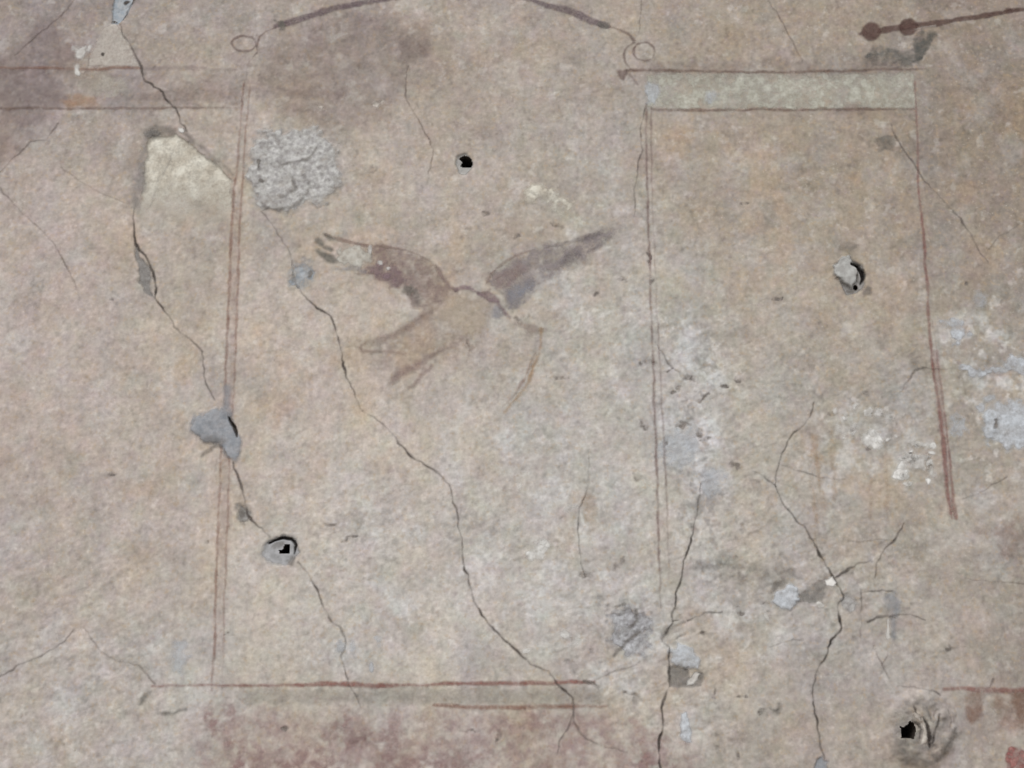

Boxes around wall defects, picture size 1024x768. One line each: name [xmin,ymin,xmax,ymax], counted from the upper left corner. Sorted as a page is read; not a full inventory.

flaking render [142,128,232,209]
flaking render [135,248,152,296]
crack [134,233,163,308]
flaking render [611,608,653,656]
flaking render [669,643,703,687]
crack [817,549,848,662]
crack [656,702,664,768]